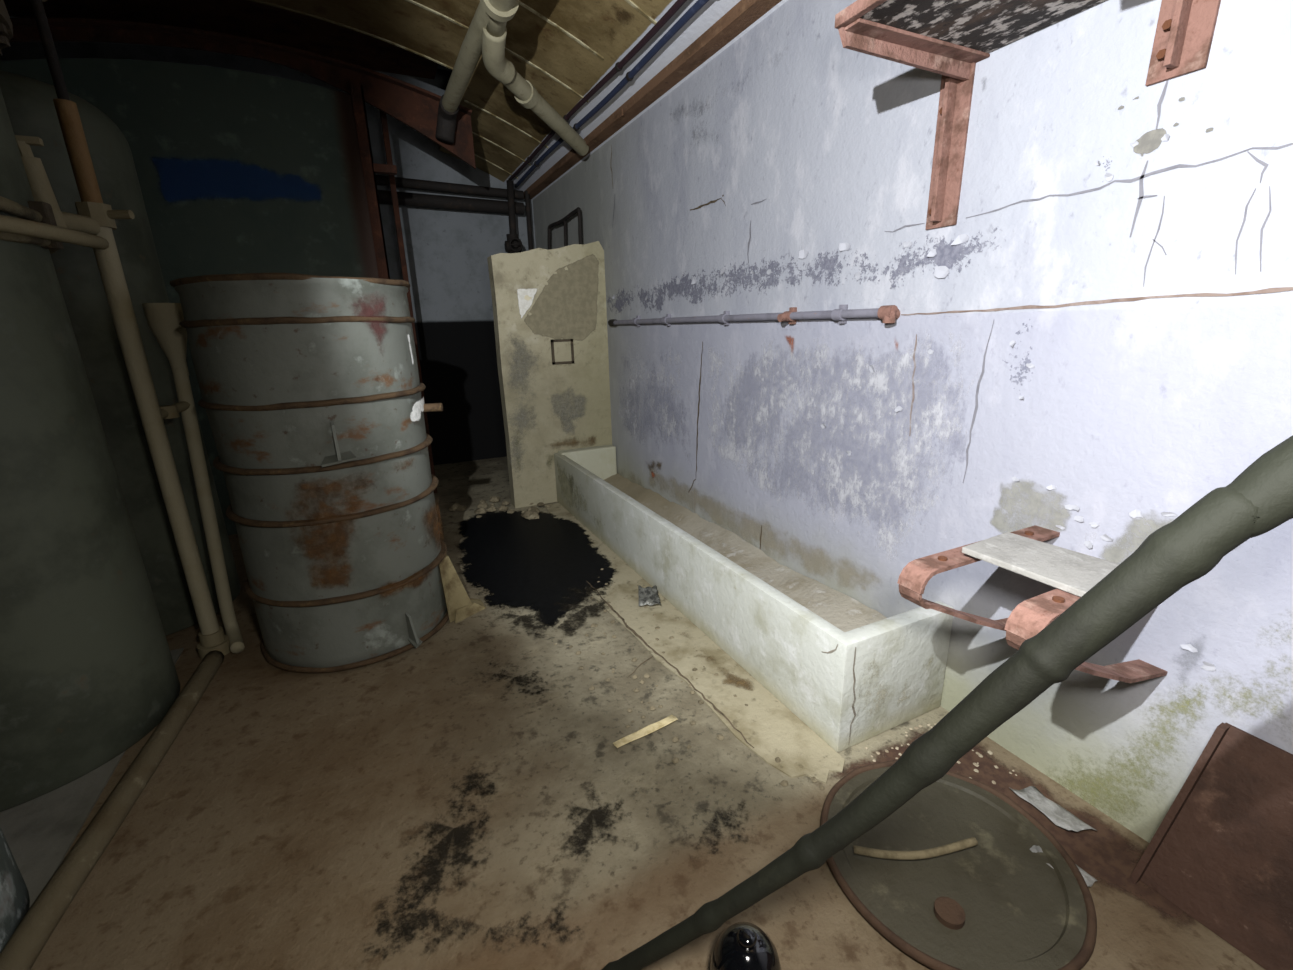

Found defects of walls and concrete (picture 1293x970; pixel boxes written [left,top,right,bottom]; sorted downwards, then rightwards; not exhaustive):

crack [1156,80,1168,129]
crack [884,223,925,232]
spalling [517,228,997,340]
crack [901,143,1293,483]
crack [688,342,703,513]
peeling [709,344,958,553]
leakage [458,469,616,638]
spalling [991,476,1177,563]
crack [823,644,856,745]